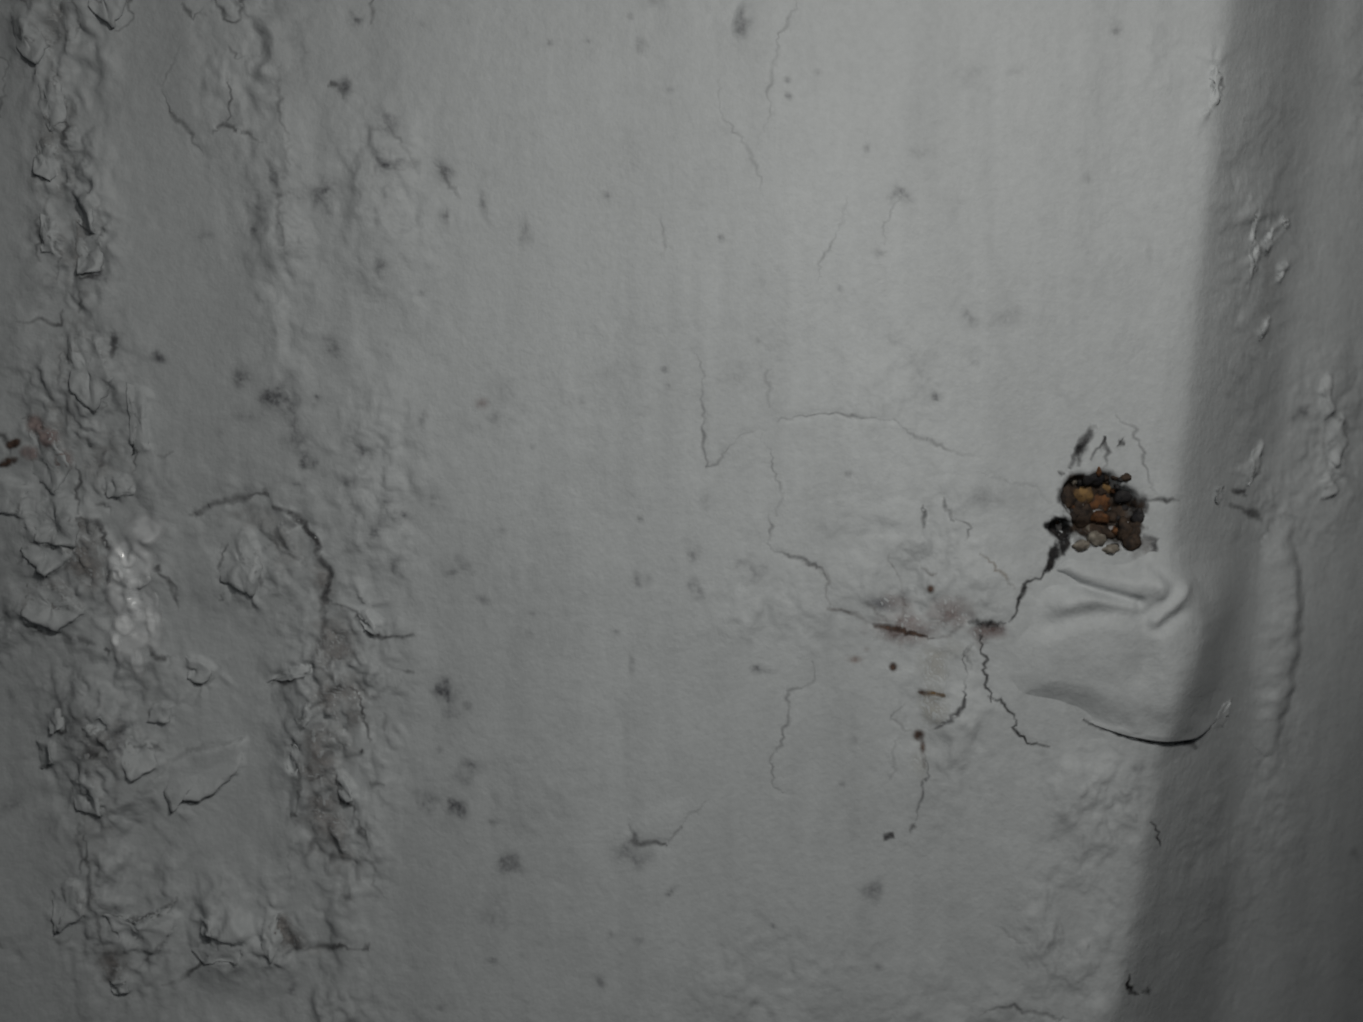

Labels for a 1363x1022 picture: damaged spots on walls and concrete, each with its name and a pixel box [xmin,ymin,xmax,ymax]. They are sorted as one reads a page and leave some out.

peeling [0,417,111,632]
peeling [219,529,263,597]
peeling [289,512,333,598]
crack [875,625,926,637]
crack [948,560,1054,744]
peeling [36,708,66,769]
peeling [121,736,158,782]
peeling [69,777,102,817]